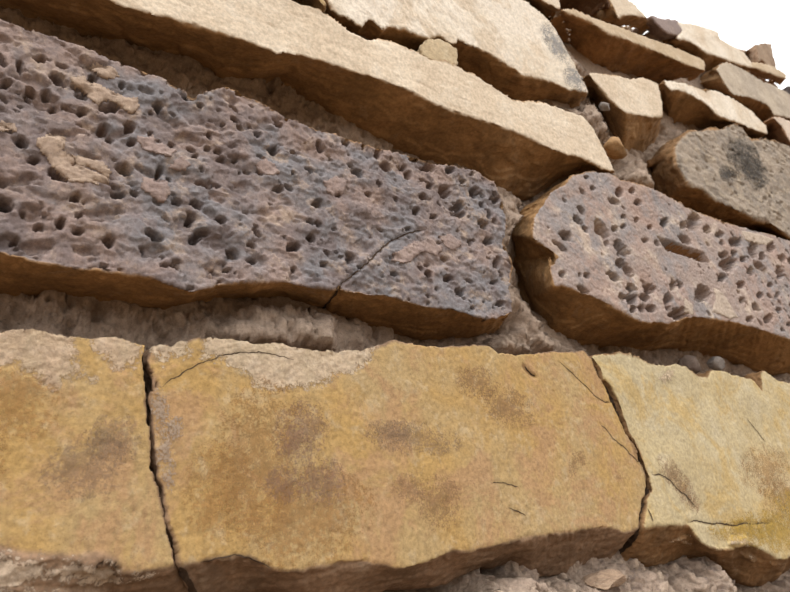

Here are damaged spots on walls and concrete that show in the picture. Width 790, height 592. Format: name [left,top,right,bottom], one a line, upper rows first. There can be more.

crack [323,229,426,308]
crack [142,351,293,426]
crack [561,363,640,462]
crack [619,474,768,554]
crack [173,558,197,592]